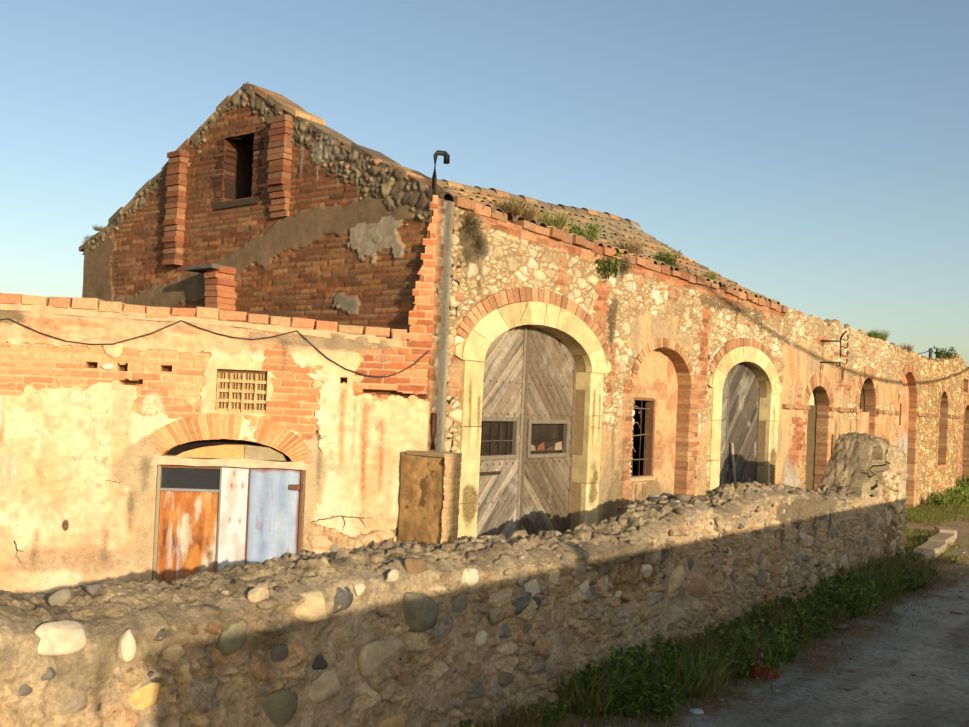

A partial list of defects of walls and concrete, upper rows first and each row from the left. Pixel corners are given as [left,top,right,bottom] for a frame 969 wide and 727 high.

peeling [346,215,409,263]
peeling [0,341,212,418]
peeling [261,344,324,440]